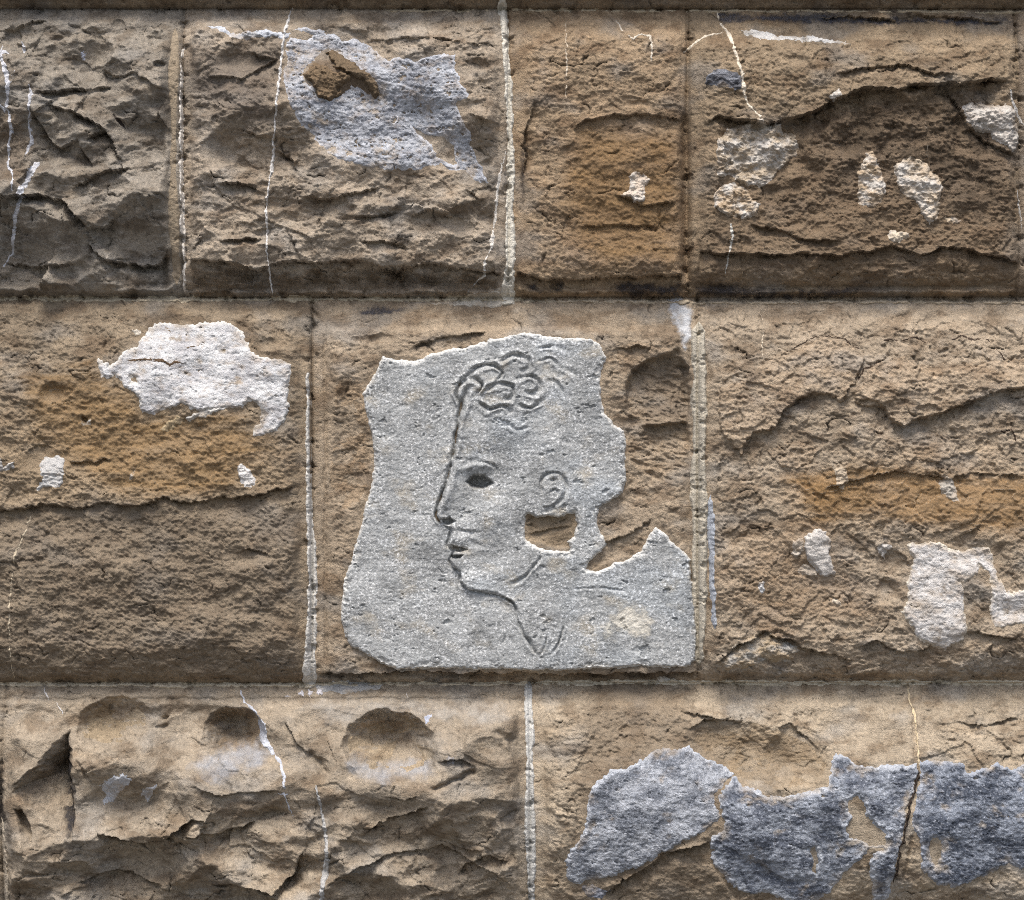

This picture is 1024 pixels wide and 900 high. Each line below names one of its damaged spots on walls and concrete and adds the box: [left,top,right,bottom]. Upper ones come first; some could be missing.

peeling [303,50,379,101]
crack [684,13,762,117]
crack [0,41,40,267]
crack [264,8,293,295]
spalling [769,89,1013,249]
peeling [158,407,226,433]
crack [240,690,294,816]
spalling [693,721,827,790]
crack [893,686,920,883]
peeling [582,884,611,899]